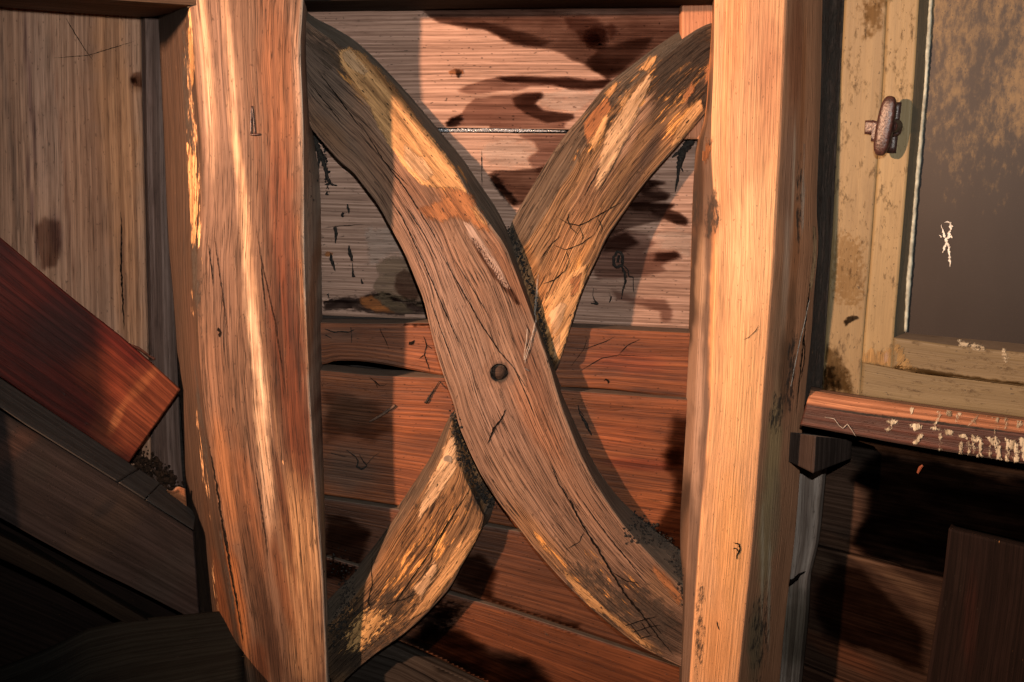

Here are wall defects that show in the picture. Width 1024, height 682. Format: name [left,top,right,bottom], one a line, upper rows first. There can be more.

crack [540,141,626,284]
crack [208,441,243,644]
crack [552,468,673,655]